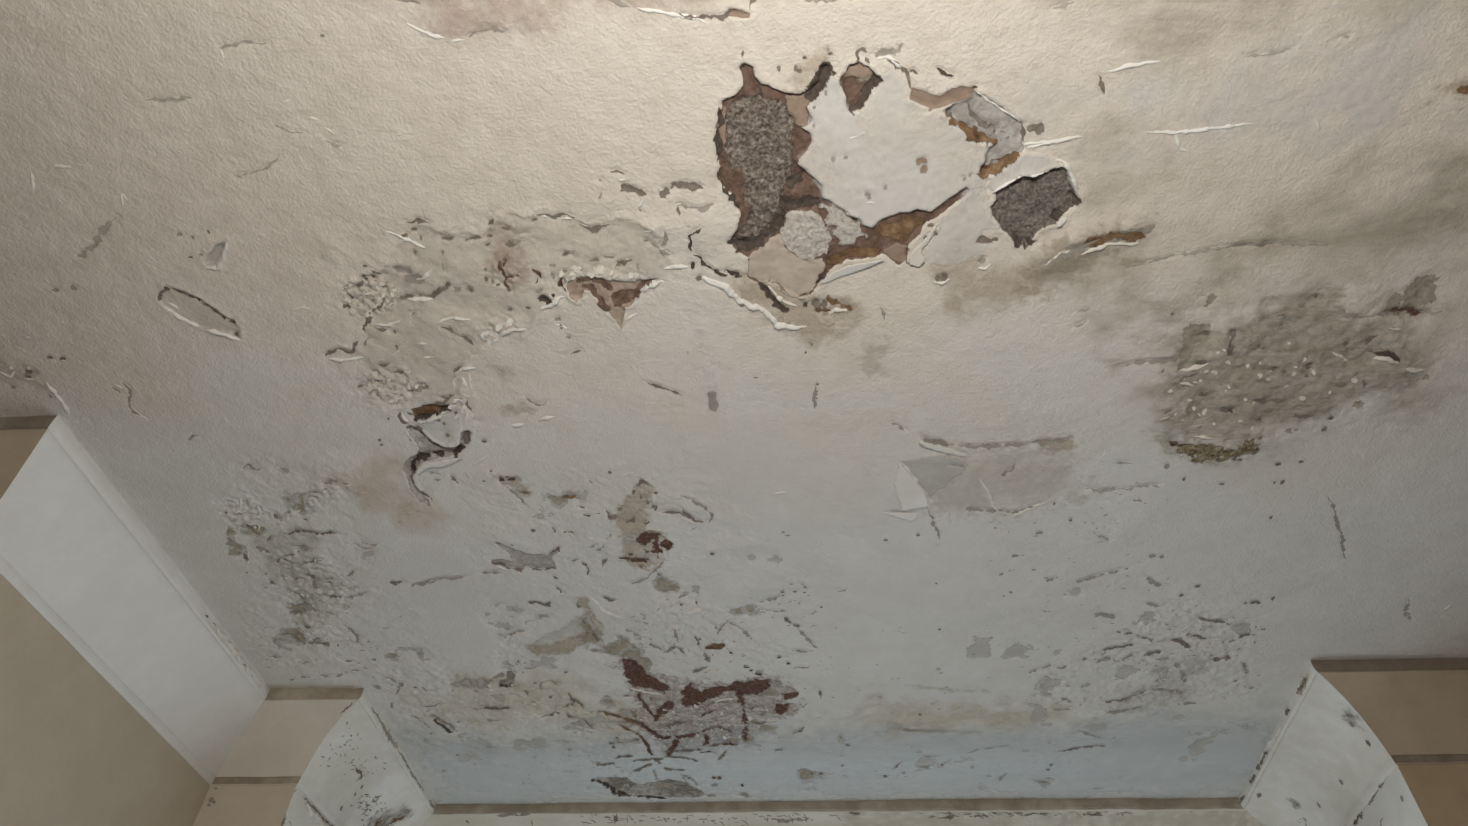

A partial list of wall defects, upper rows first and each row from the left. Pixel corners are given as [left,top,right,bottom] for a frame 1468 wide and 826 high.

peeling [177,230,228,270]
peeling [437,43,1082,354]
peeling [158,287,241,341]
peeling [225,218,823,799]
peeling [884,436,1169,546]
spalling [1327,496,1346,559]
peeling [966,536,1275,761]
rust [591,642,822,797]
peeling [796,765,846,790]